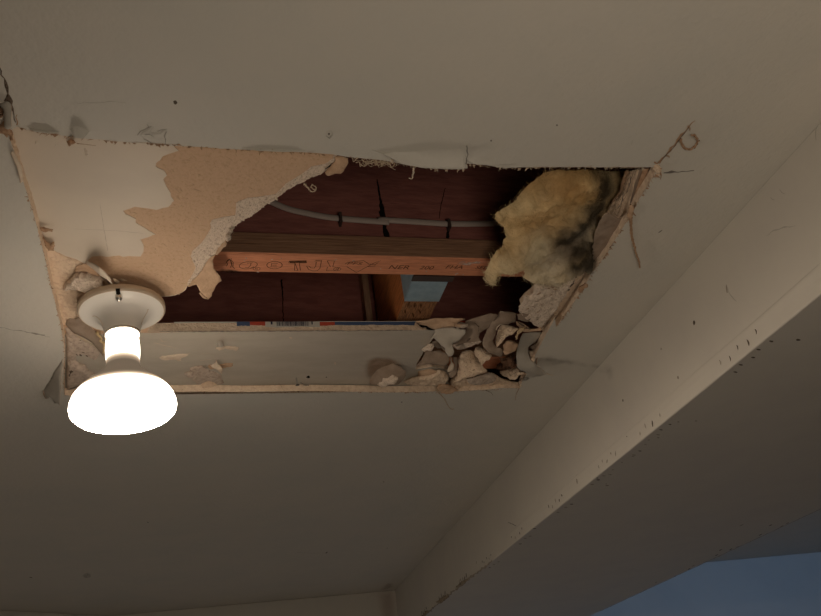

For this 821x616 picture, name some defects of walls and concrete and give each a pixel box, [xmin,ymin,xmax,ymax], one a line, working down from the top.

crack [0,68,18,140]
crack [653,121,700,180]
peeling [55,146,335,296]
spalling [517,277,577,328]
peeling [42,359,73,405]